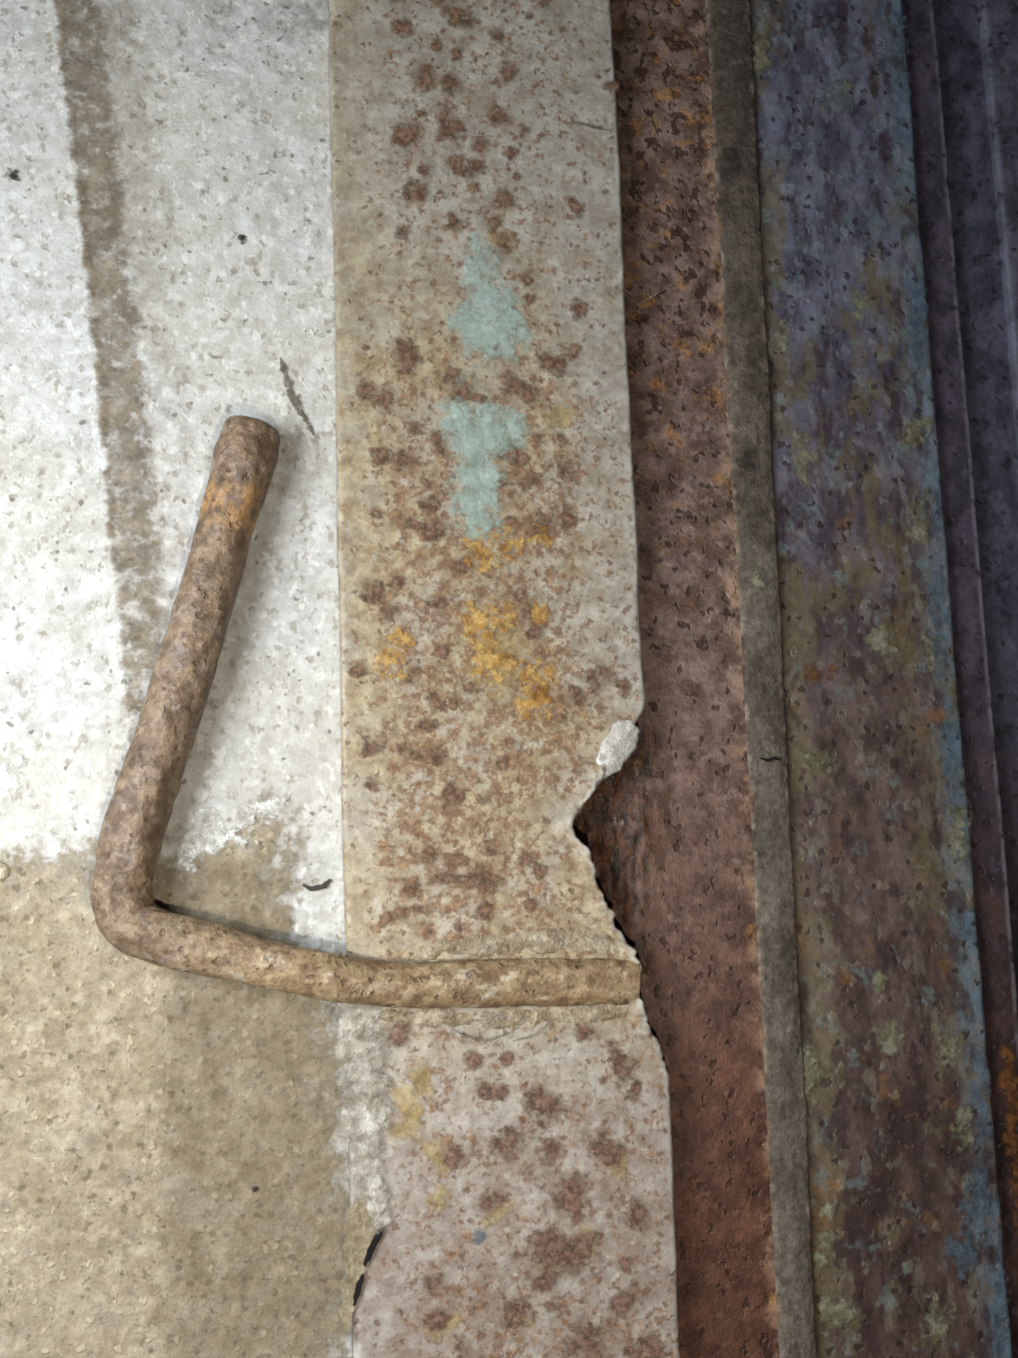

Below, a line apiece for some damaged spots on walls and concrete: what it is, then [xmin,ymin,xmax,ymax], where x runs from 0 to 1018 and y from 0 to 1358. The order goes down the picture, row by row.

rust [349,576,421,683]
rust [356,0,780,1358]
peeling [596,720,640,785]
leakage [153,796,304,945]
leakage [0,838,352,1358]
rust [998,1046,1018,1226]